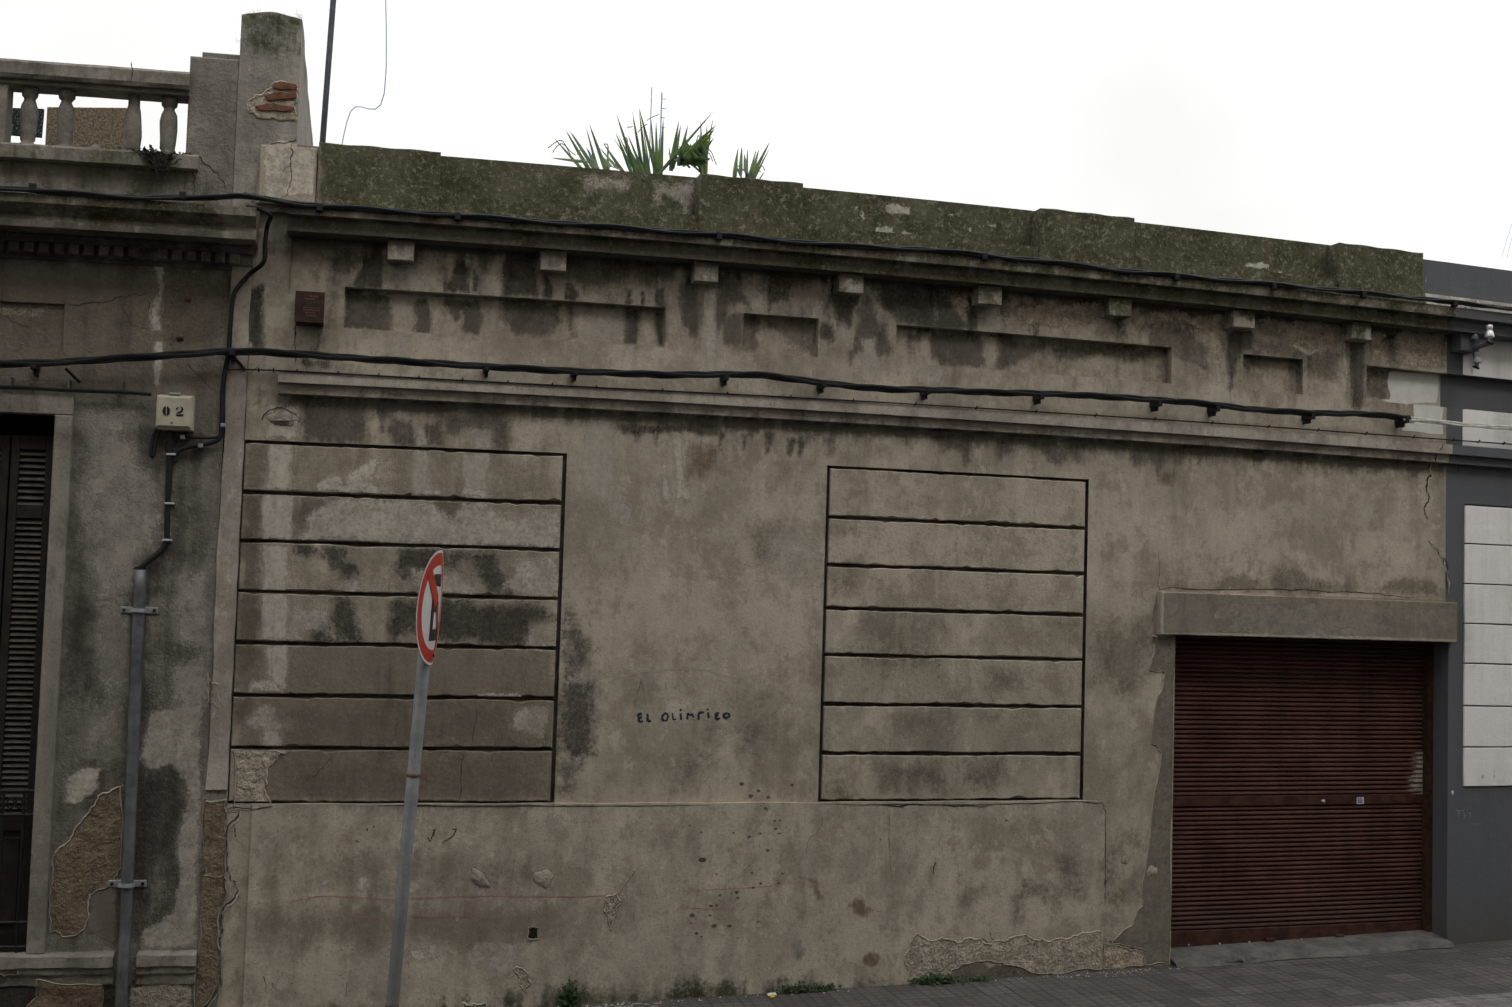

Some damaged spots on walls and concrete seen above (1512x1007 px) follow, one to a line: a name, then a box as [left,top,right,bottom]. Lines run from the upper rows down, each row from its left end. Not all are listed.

flaking render [247,80,299,122]
flaking render [263,139,315,198]
damp [330,244,483,357]
damp [500,252,782,371]
damp [239,402,510,689]
damp [395,547,594,790]
flaking render [479,693,548,736]
flaking render [1213,591,1360,637]
crack [1149,445,1459,677]
flaking render [129,572,288,1007]
spalling [903,601,1180,981]
spalling [26,979,104,1007]